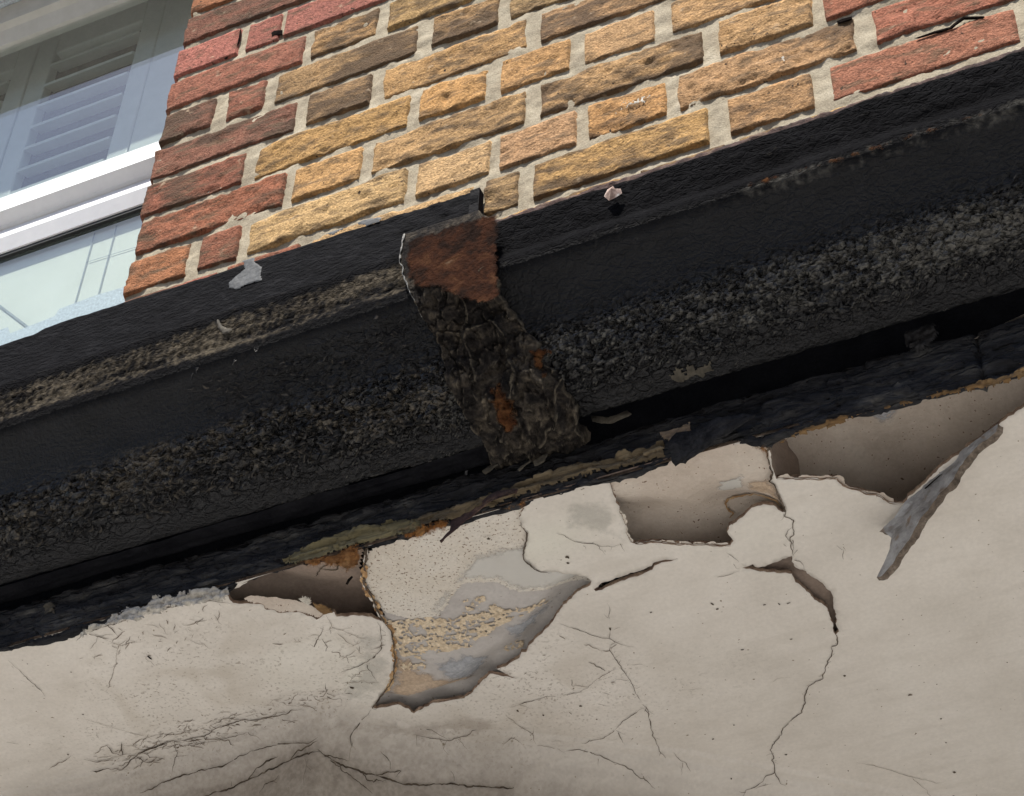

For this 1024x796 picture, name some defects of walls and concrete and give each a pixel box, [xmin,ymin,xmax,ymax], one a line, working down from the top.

corrosion [406,216,499,302]
spalling [611,377,1024,580]
crack [77,596,226,687]
crack [52,619,512,796]
spalling [229,508,604,712]
crack [741,635,838,796]
spalling [751,556,838,632]